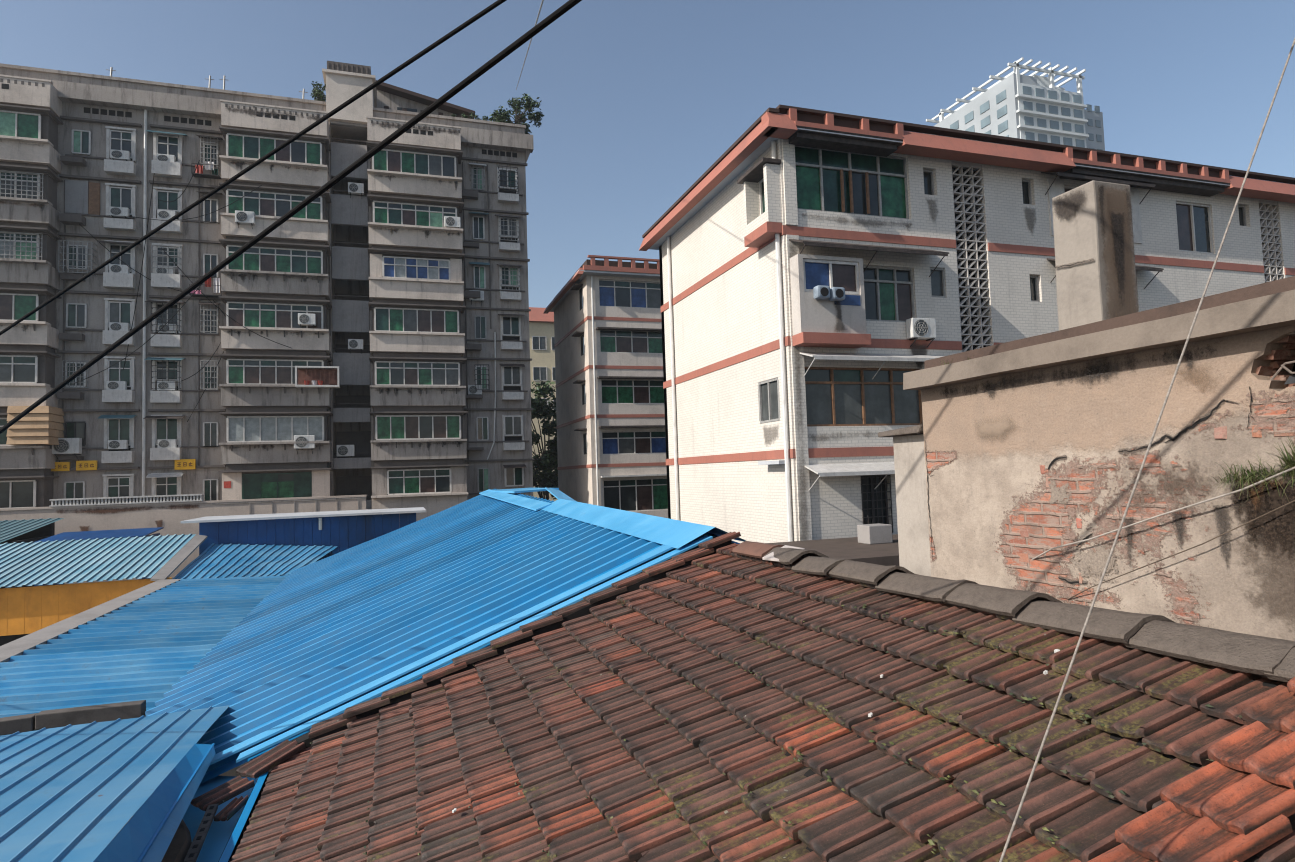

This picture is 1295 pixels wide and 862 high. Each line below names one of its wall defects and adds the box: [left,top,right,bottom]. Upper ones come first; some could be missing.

water stain [1054,185,1138,318]
spalling [925,450,957,474]
crack [1118,387,1253,454]
spalling [1186,335,1295,443]
spalling [993,446,1215,627]
water stain [1124,518,1133,562]
water stain [1128,464,1295,631]